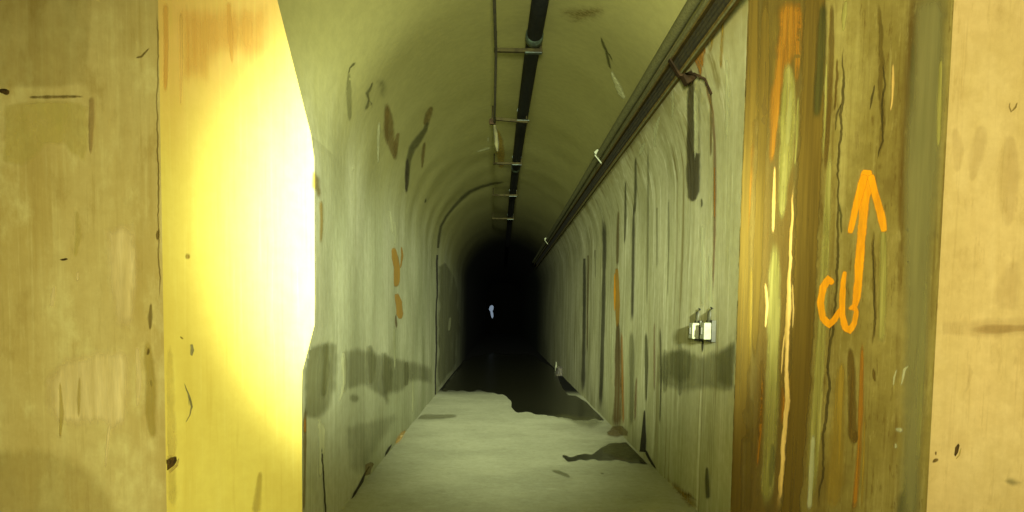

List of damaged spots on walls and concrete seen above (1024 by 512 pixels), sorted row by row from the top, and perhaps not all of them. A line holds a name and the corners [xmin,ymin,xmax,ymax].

rust [385,106,399,158]
rust [607,325,628,437]
leakage [635,326,689,416]
leakage [624,83,703,315]
rust [695,24,724,281]
rust [731,0,834,512]
crack [818,58,845,495]
rust [829,348,865,505]